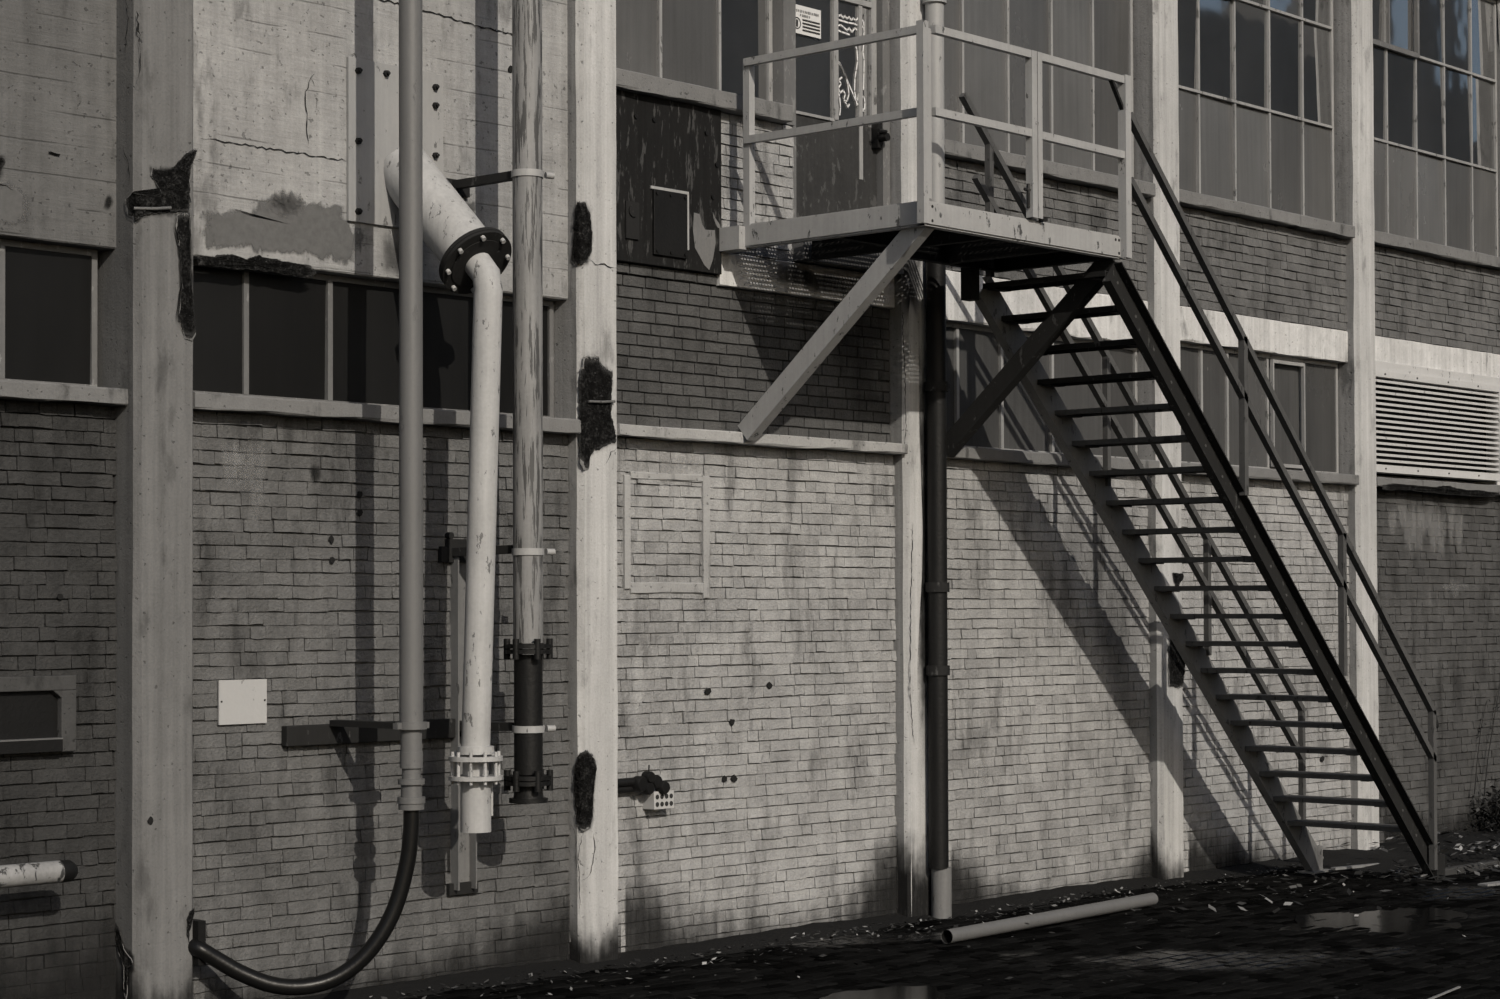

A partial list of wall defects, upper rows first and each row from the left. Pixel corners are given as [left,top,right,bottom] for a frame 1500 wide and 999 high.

crack [380,0,512,35]
spalling [125,149,317,341]
spalling [570,201,593,265]
spalling [578,356,617,470]
spalling [1168,638,1185,689]
spalling [573,750,597,831]